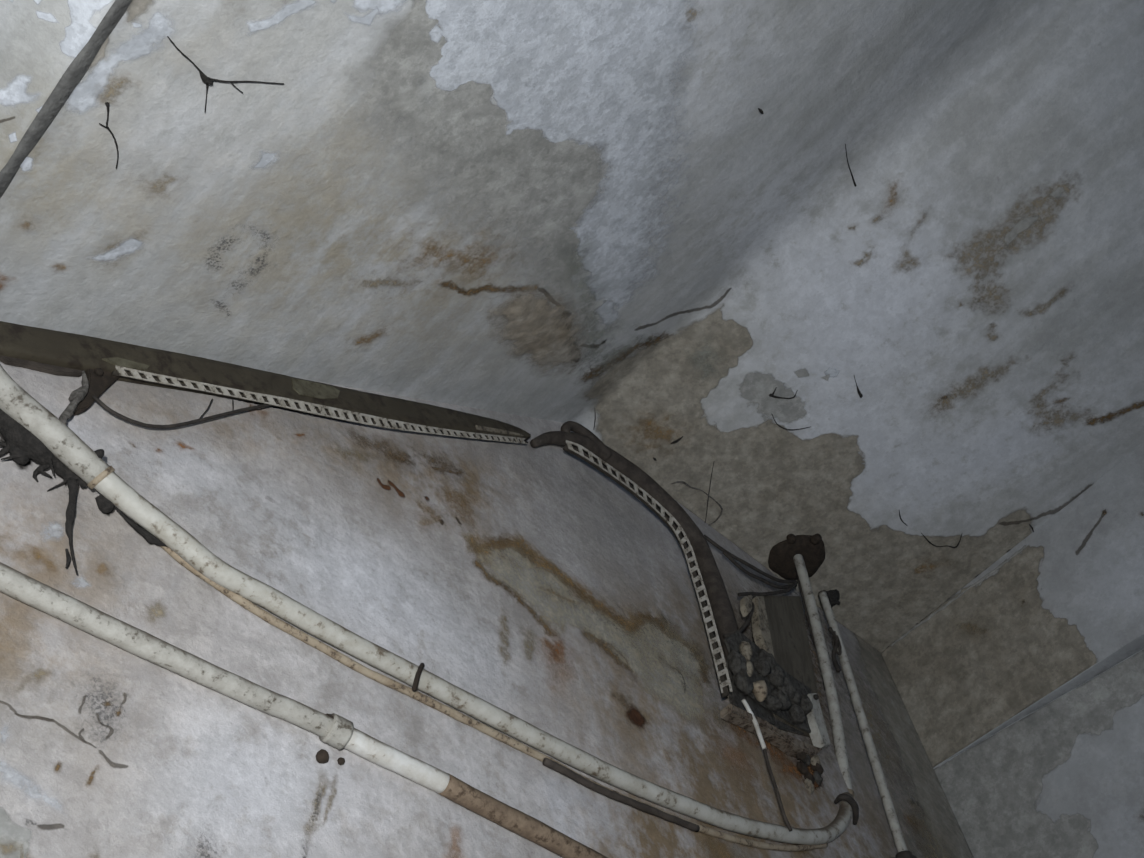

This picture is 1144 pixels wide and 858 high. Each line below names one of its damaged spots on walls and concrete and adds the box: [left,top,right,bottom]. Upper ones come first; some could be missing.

peeling [349,0,405,25]
peeling [34,0,173,112]
peeling [0,76,43,113]
peeling [20,157,32,171]
peeling [425,0,692,329]
peeling [94,239,142,261]
peeling [959,184,1070,301]
crack [442,281,560,306]
peeling [585,305,1144,858]
leakage [465,535,708,722]
crack [0,701,128,768]
rust [612,694,646,727]